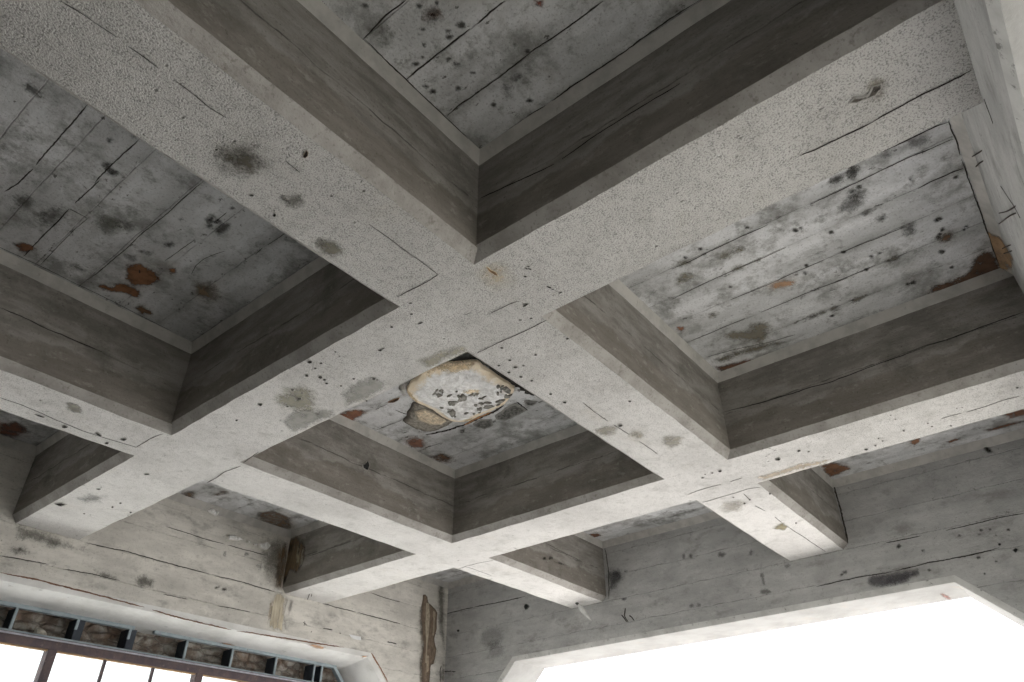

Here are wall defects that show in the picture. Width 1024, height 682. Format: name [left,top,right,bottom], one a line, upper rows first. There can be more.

crack [800,70,971,156]
crack [6,105,87,191]
water stain [214,145,265,174]
mould [830,167,885,221]
crack [0,141,200,330]
corrosion [98,263,159,315]
crack [369,224,437,297]
corrosion [928,232,1013,294]
water stain [276,389,332,431]
corrosion [340,410,364,420]
corrosion [822,463,850,476]
water stain [869,569,931,586]